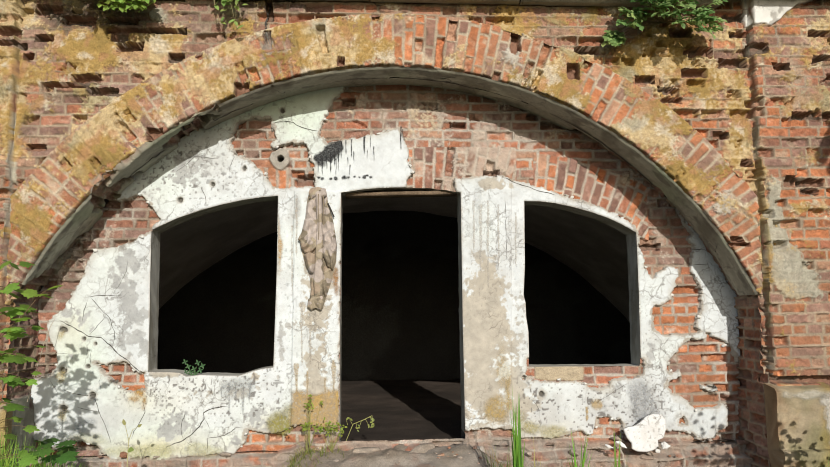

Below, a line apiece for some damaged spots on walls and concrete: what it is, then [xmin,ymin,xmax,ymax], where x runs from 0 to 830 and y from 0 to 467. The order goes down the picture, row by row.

spalling [806,20,830,65]
flaking render [9,56,250,378]
flaking render [232,119,315,189]
flaking render [320,85,740,431]
peeling [617,0,830,295]
crack [52,262,142,442]
flaking render [98,362,146,391]
crack [161,406,235,456]